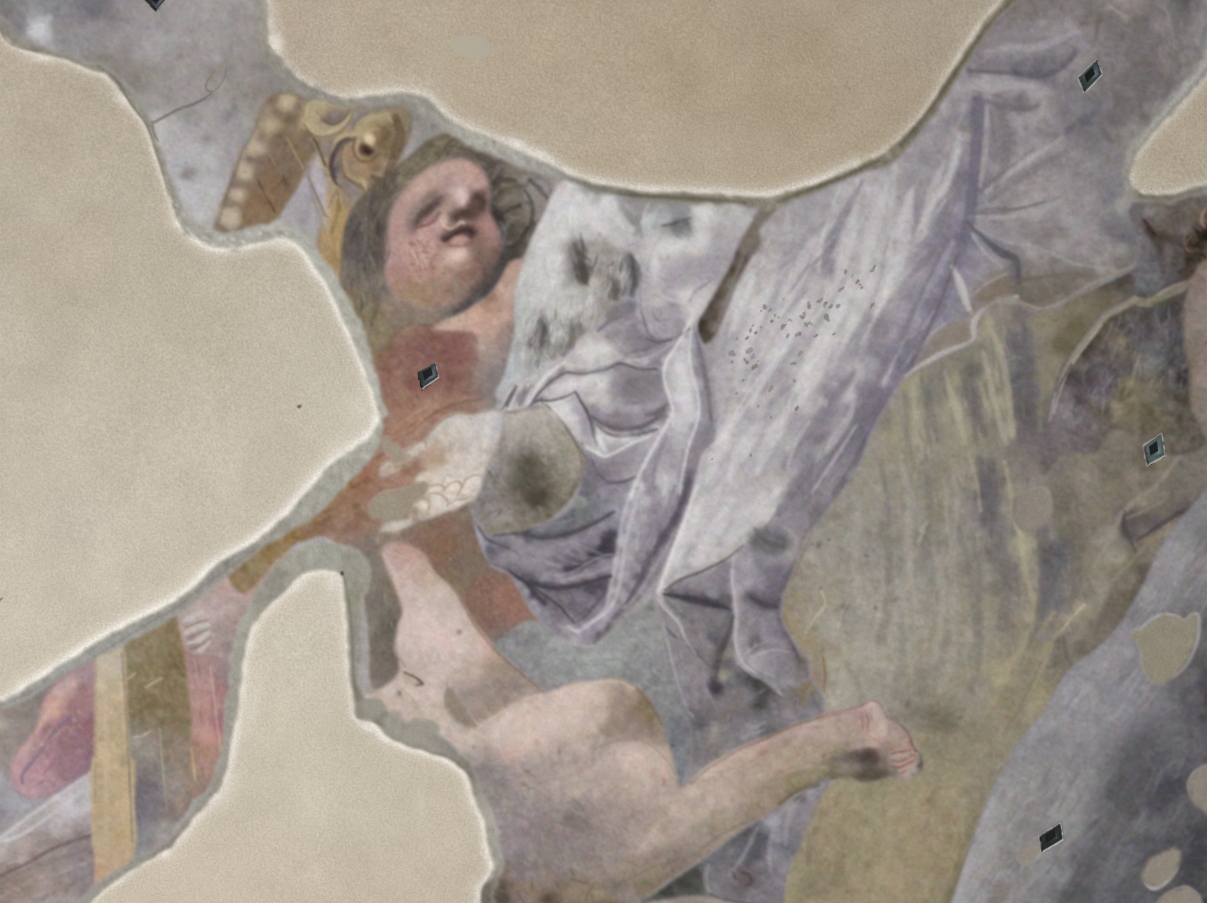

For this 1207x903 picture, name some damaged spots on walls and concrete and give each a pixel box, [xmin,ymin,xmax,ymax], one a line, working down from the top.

flaking render [255,0,1016,210]
flaking render [1123,49,1207,204]
flaking render [0,16,387,709]
flaking render [79,539,504,903]